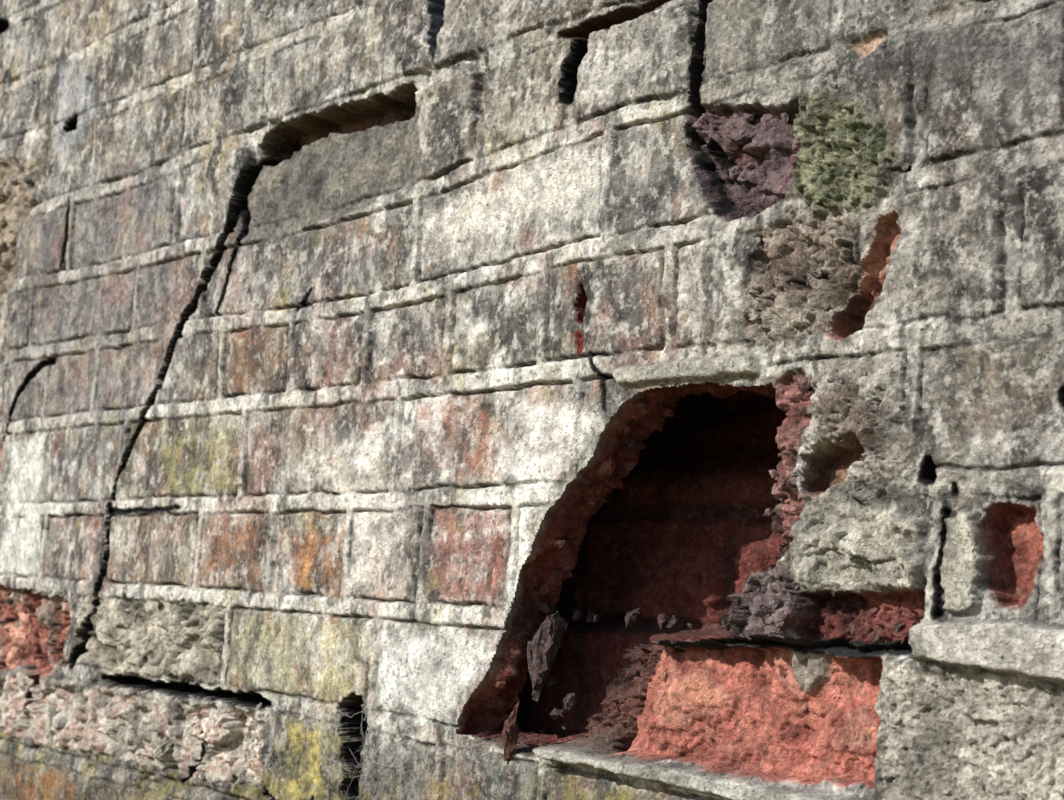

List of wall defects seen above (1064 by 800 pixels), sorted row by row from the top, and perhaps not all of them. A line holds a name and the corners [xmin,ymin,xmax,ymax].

crack [2,355,60,446]
crack [68,141,302,671]
crack [295,286,313,313]
spalling [684,101,901,355]
spalling [456,365,1064,800]
crack [930,505,953,621]
spalling [0,583,268,794]